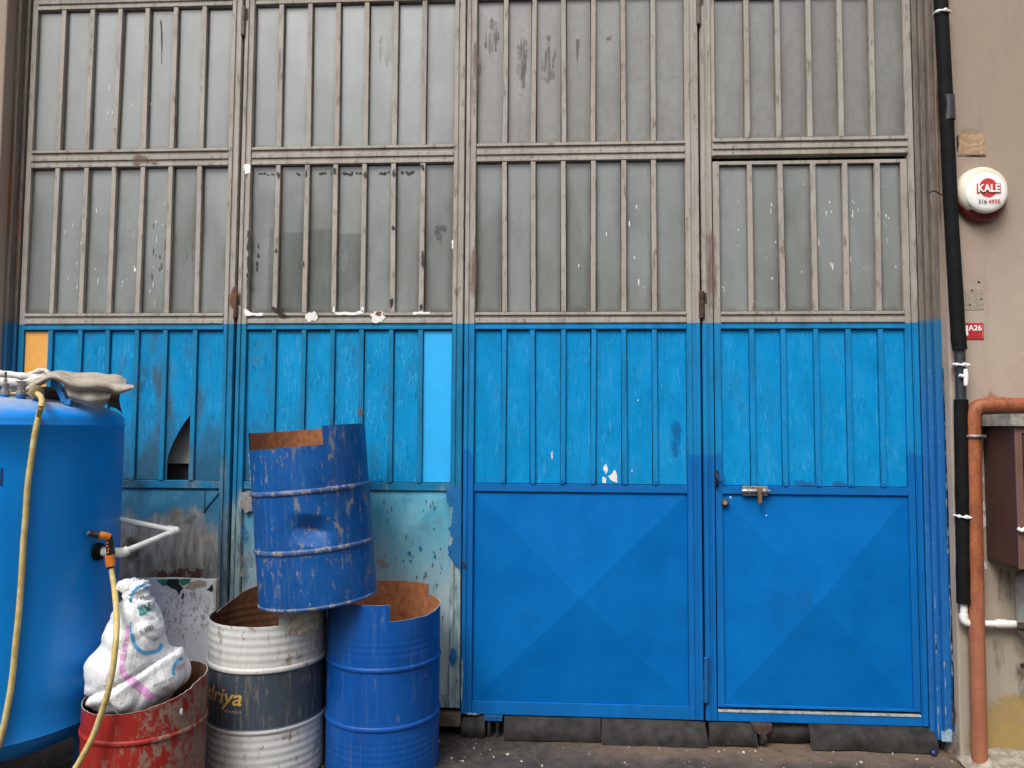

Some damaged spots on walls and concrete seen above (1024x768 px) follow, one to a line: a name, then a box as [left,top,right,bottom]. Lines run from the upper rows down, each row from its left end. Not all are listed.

peeling [602,464,618,483]